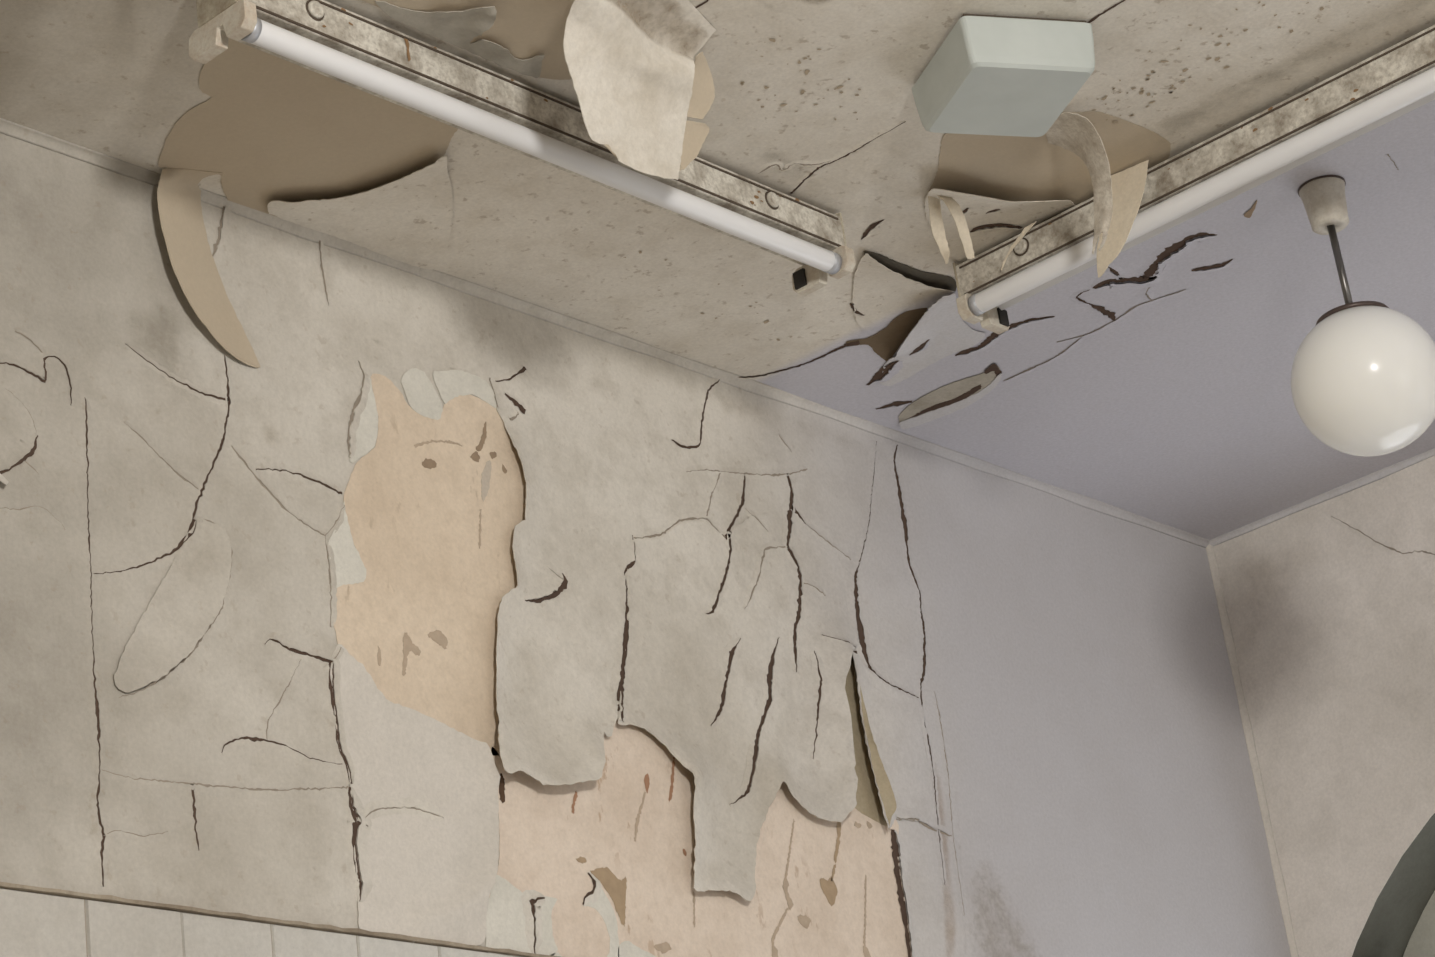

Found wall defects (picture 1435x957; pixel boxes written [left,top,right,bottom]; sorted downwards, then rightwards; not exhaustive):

peeling [157,38,458,368]
peeling [363,0,716,180]
crack [695,0,716,11]
crack [861,220,885,240]
peeling [846,111,1171,386]
peeling [899,363,1002,429]
crack [0,329,444,902]
flaking render [328,368,935,957]
crack [610,227,1234,957]
crack [1331,516,1435,560]